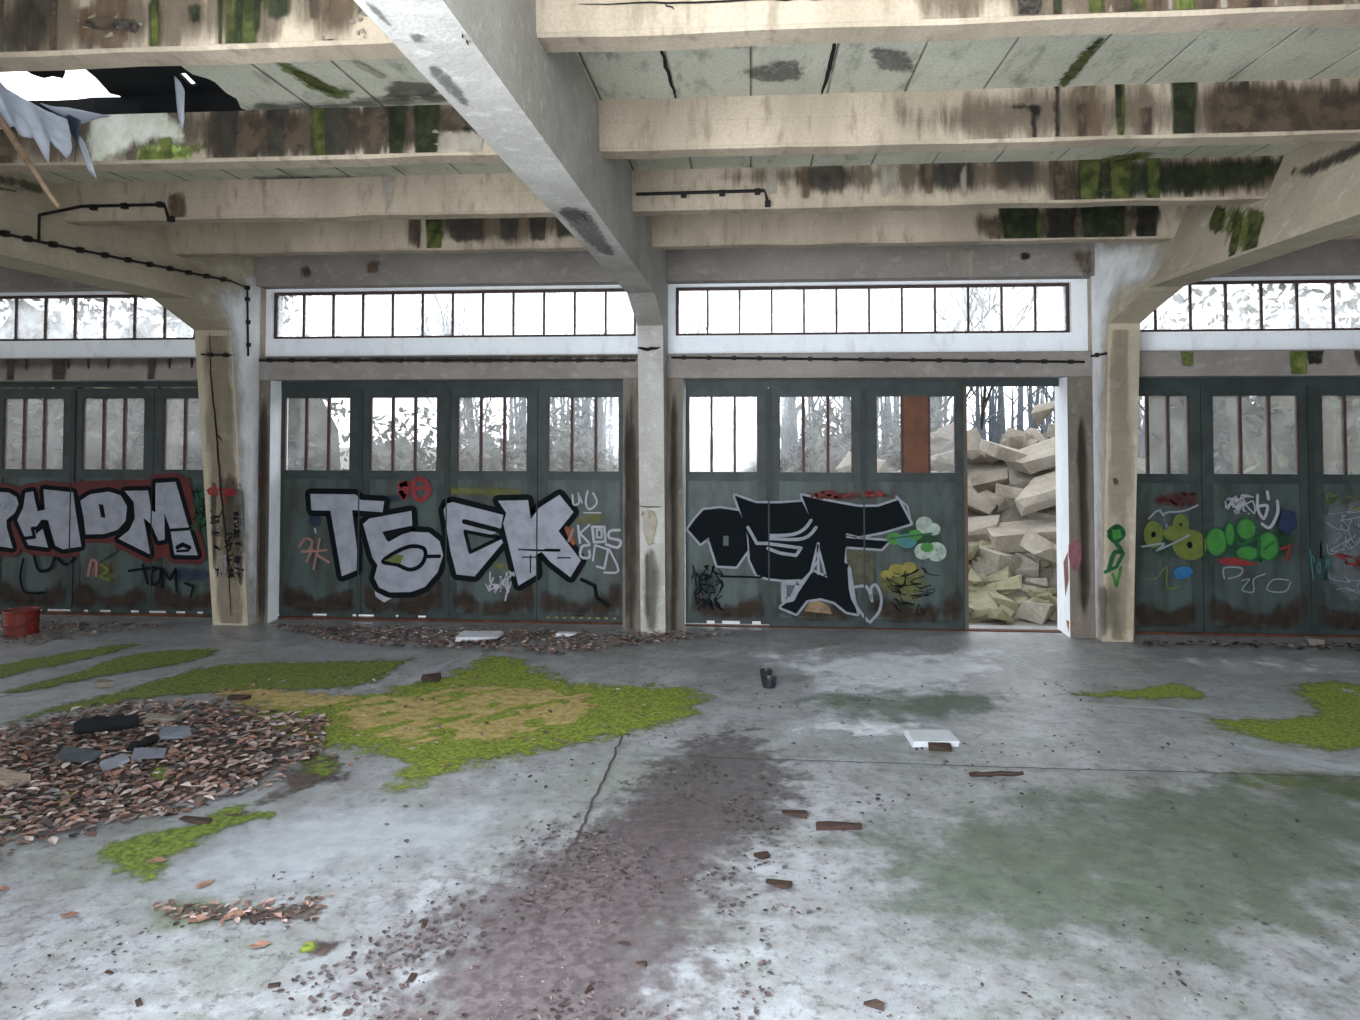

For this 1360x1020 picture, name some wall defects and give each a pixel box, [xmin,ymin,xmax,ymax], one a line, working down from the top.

damp [0,0,226,52]
damp [255,1,282,39]
damp [304,0,390,31]
crack [589,0,791,9]
damp [921,0,979,18]
damp [1011,0,1310,16]
crack [660,51,677,99]
damp [738,160,1091,277]
damp [1124,205,1160,237]
crack [536,735,1360,920]